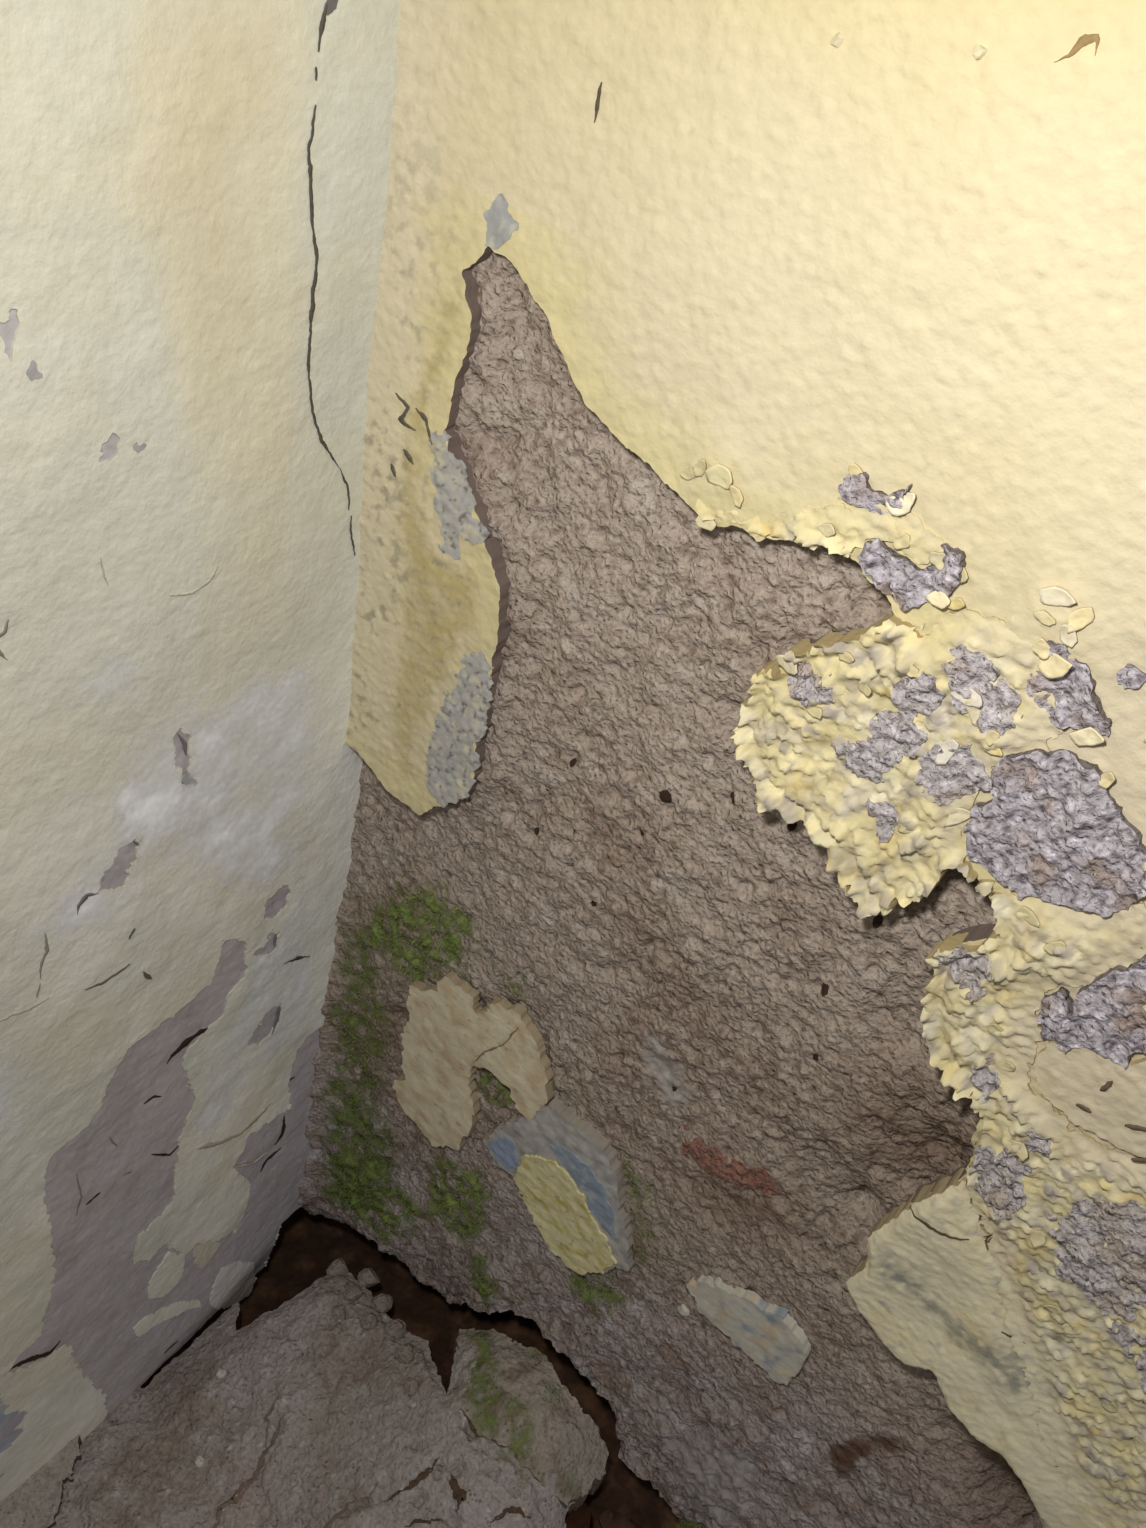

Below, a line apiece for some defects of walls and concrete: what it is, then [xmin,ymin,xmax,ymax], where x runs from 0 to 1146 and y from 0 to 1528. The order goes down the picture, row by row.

peeling [483,193,519,250]
crack [307,0,355,556]
peeling [0,309,18,359]
peeling [26,360,43,381]
peeling [99,433,146,463]
peeling [173,730,198,786]
peeling [77,840,139,915]
peeling [264,885,290,919]
flaking render [295,251,1146,1528]
peeling [254,932,279,956]
peeling [11,939,319,1415]
crack [140,1207,681,1528]